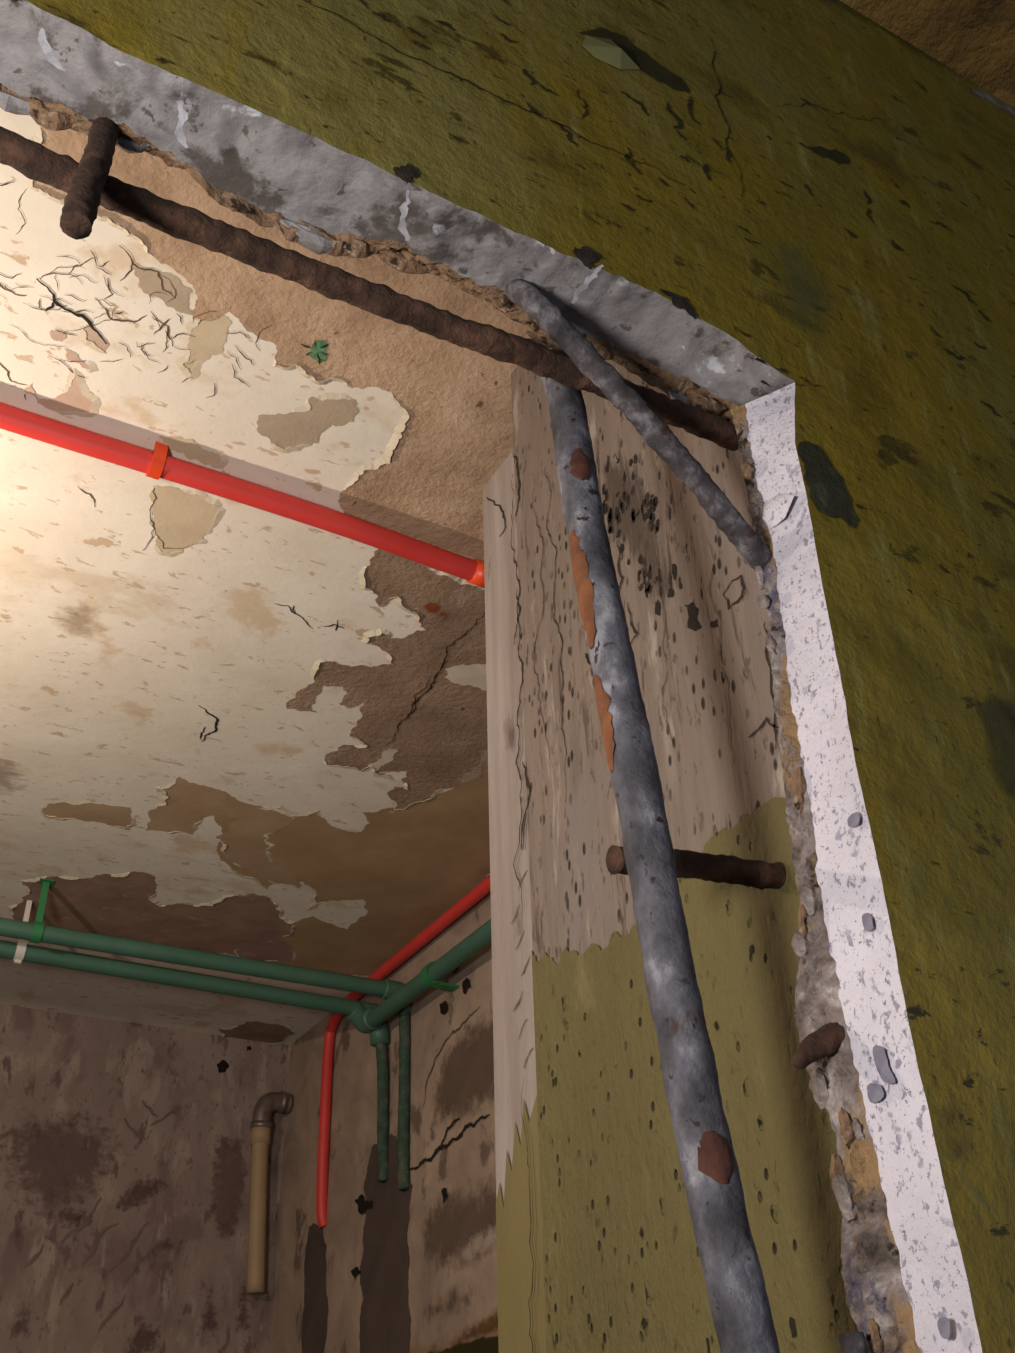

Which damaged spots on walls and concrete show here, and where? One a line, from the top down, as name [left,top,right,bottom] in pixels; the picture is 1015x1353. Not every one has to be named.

crack [304,0,687,186]
crack [0,182,25,234]
peeling [108,123,563,351]
crack [0,246,273,398]
peeling [96,205,517,562]
peeling [8,549,490,976]
spalling [581,333,923,1353]
damp [977,697,1015,793]
damp [1,1118,114,1226]
damp [212,1141,247,1235]
crack [410,1006,489,1170]
corrosion [698,1130,734,1184]